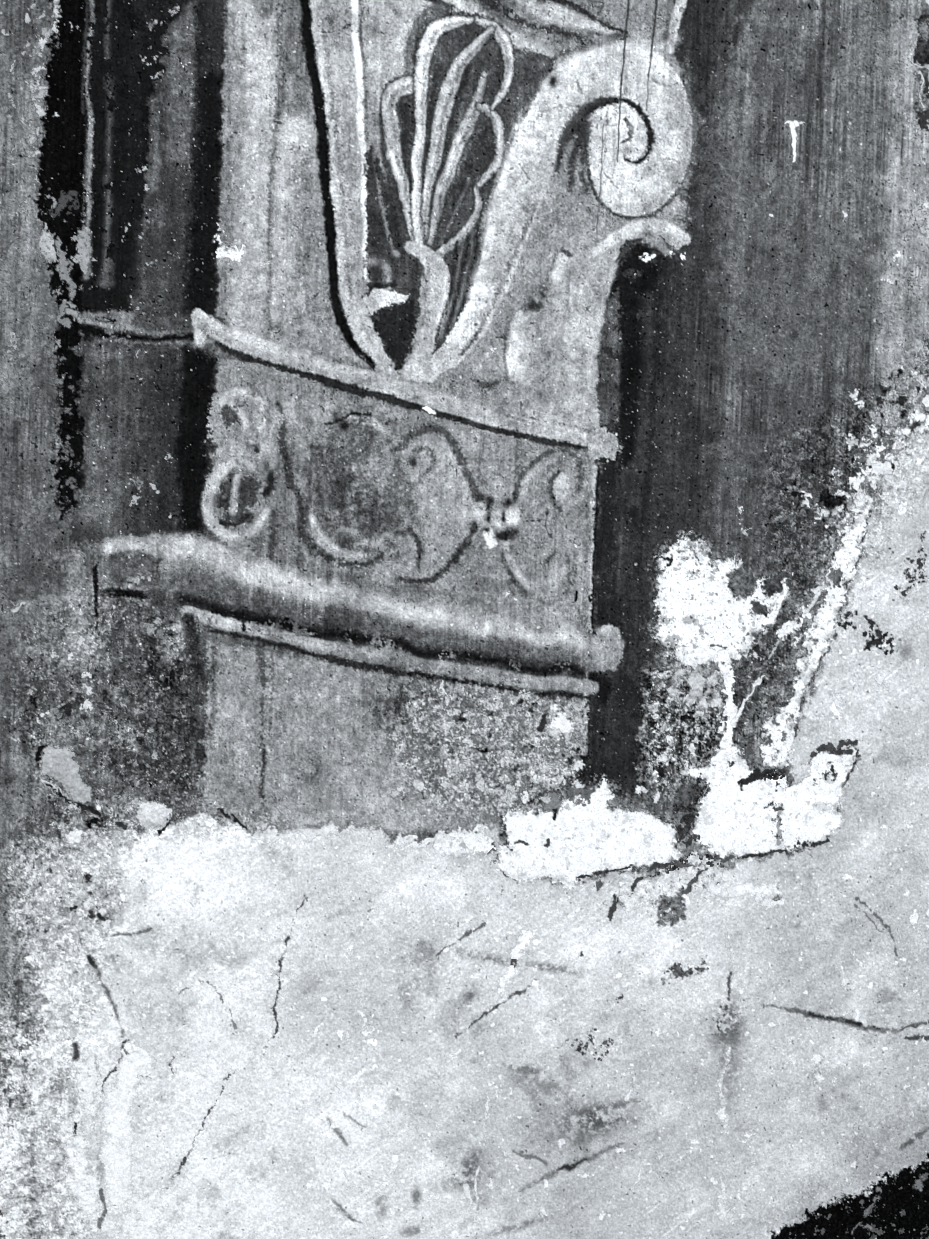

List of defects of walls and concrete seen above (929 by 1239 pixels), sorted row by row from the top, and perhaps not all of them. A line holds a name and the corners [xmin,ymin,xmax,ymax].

peeling [7,0,97,361]
peeling [213,223,246,266]
flaking render [8,369,929,1239]
crack [263,902,304,1055]
crack [145,1074,230,1197]